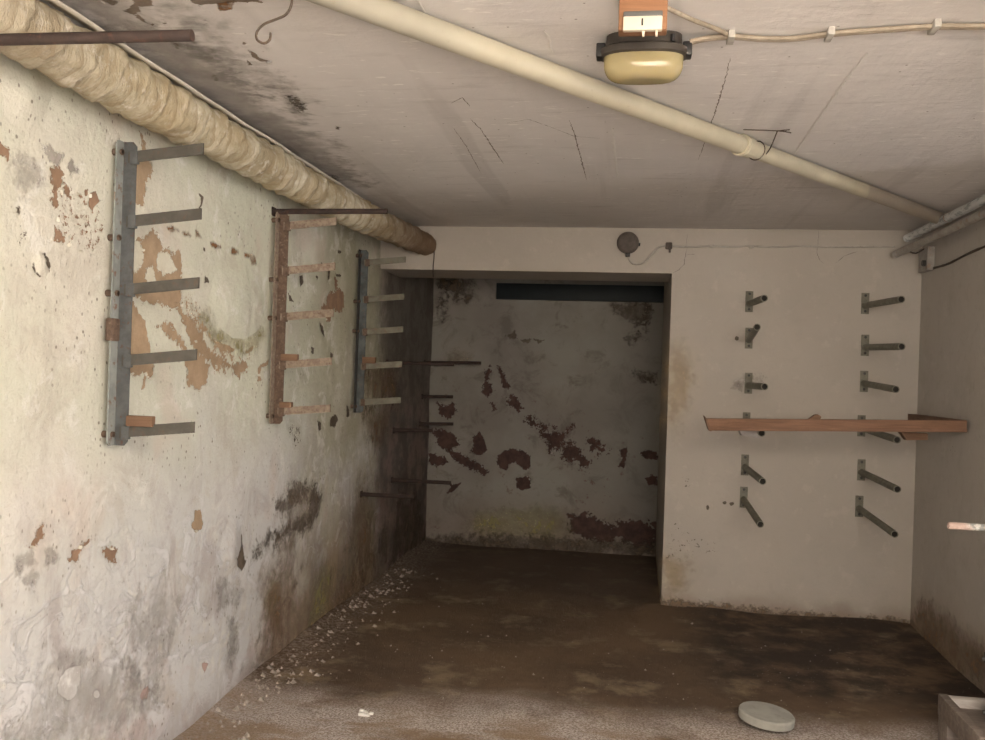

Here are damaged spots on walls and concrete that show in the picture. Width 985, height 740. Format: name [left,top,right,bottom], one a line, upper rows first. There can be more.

peeling [99,0,167,26]
peeling [190,0,263,11]
peeling [0,142,10,162]
peeling [49,164,104,252]
peeling [130,228,269,392]
peeling [316,263,344,335]
peeling [428,401,531,491]
peeling [480,365,658,472]
peeling [29,524,45,549]
peeling [67,539,89,562]
peeling [102,546,118,564]
leakage [255,481,322,559]